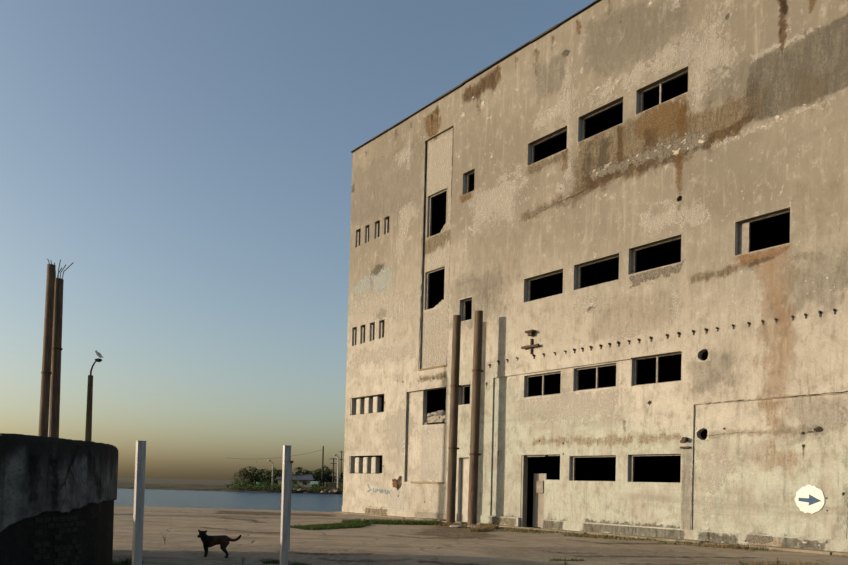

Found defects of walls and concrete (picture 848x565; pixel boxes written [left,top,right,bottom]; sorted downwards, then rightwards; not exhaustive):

rust [778,0,788,49]
rust [425,107,441,139]
rust [464,67,501,110]
peeling [533,34,700,199]
leakage [572,14,848,203]
peeling [584,97,837,182]
rust [674,150,683,194]
crack [521,188,587,222]
peeling [354,203,414,294]